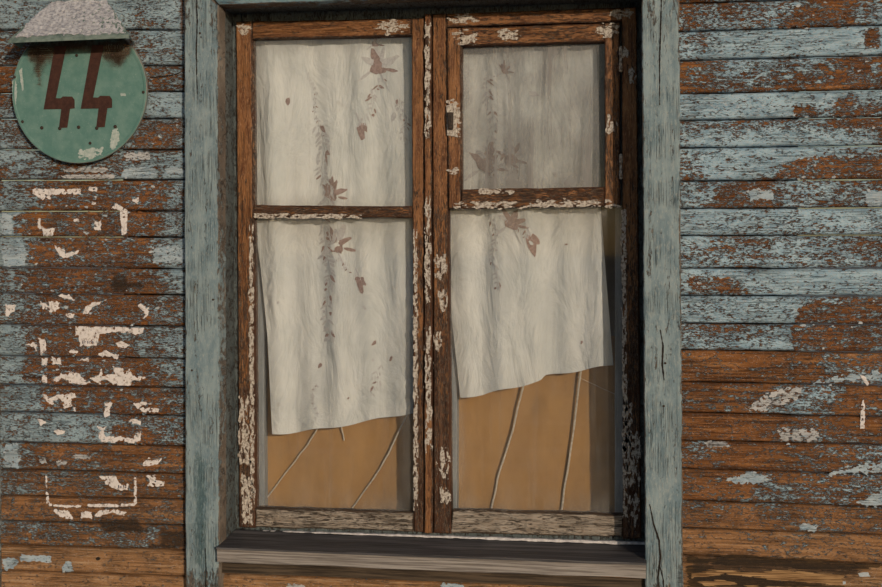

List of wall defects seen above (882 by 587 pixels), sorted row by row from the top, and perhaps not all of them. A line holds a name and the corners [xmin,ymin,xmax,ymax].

peeling [447,13,480,45]
peeling [497,26,518,42]
peeling [596,9,634,38]
peeling [778,0,848,29]
peeling [605,114,618,134]
peeling [793,92,882,130]
peeling [713,152,882,208]
peeling [12,128,168,447]
peeling [790,299,882,352]
peeling [412,197,451,509]
peeling [454,188,642,529]
crack [649,504,664,587]